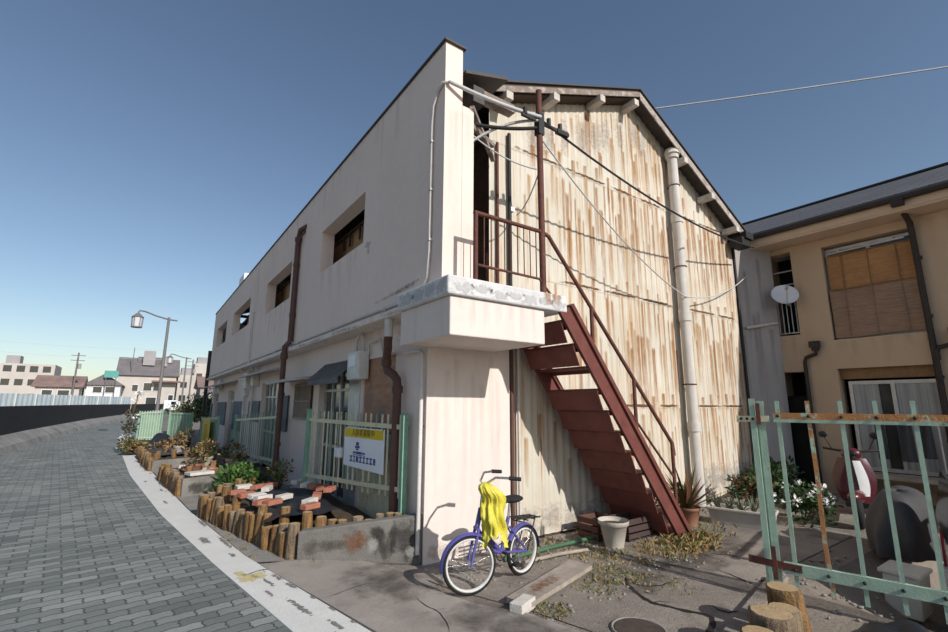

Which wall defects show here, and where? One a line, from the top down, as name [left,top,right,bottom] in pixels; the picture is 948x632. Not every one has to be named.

corrosion [517,112,669,280]
corrosion [546,273,678,380]
corrosion [627,394,677,423]
damp [368,527,416,561]
crack [624,577,738,632]